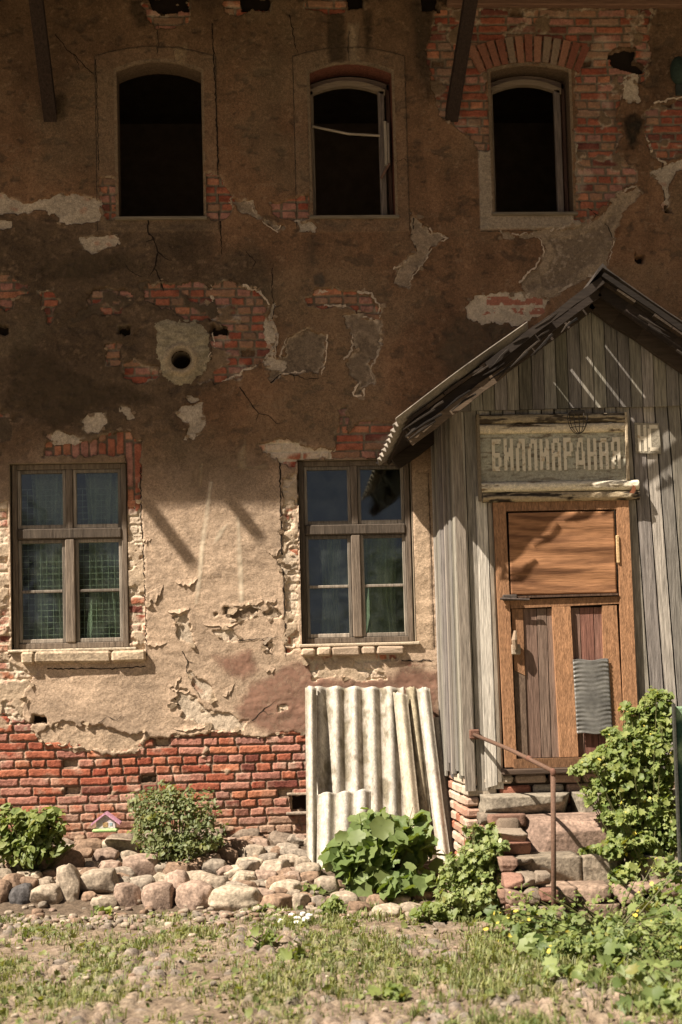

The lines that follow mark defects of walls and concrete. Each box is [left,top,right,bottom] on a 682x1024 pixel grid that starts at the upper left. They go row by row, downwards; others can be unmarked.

peeling [0,178,116,230]
crack [125,220,172,291]
crack [211,23,219,170]
peeling [393,212,448,288]
spalling [421,0,682,327]
spalling [0,275,287,385]
peeling [305,287,386,400]
spalling [42,406,151,650]
spalling [213,406,401,682]
spalling [0,500,306,841]